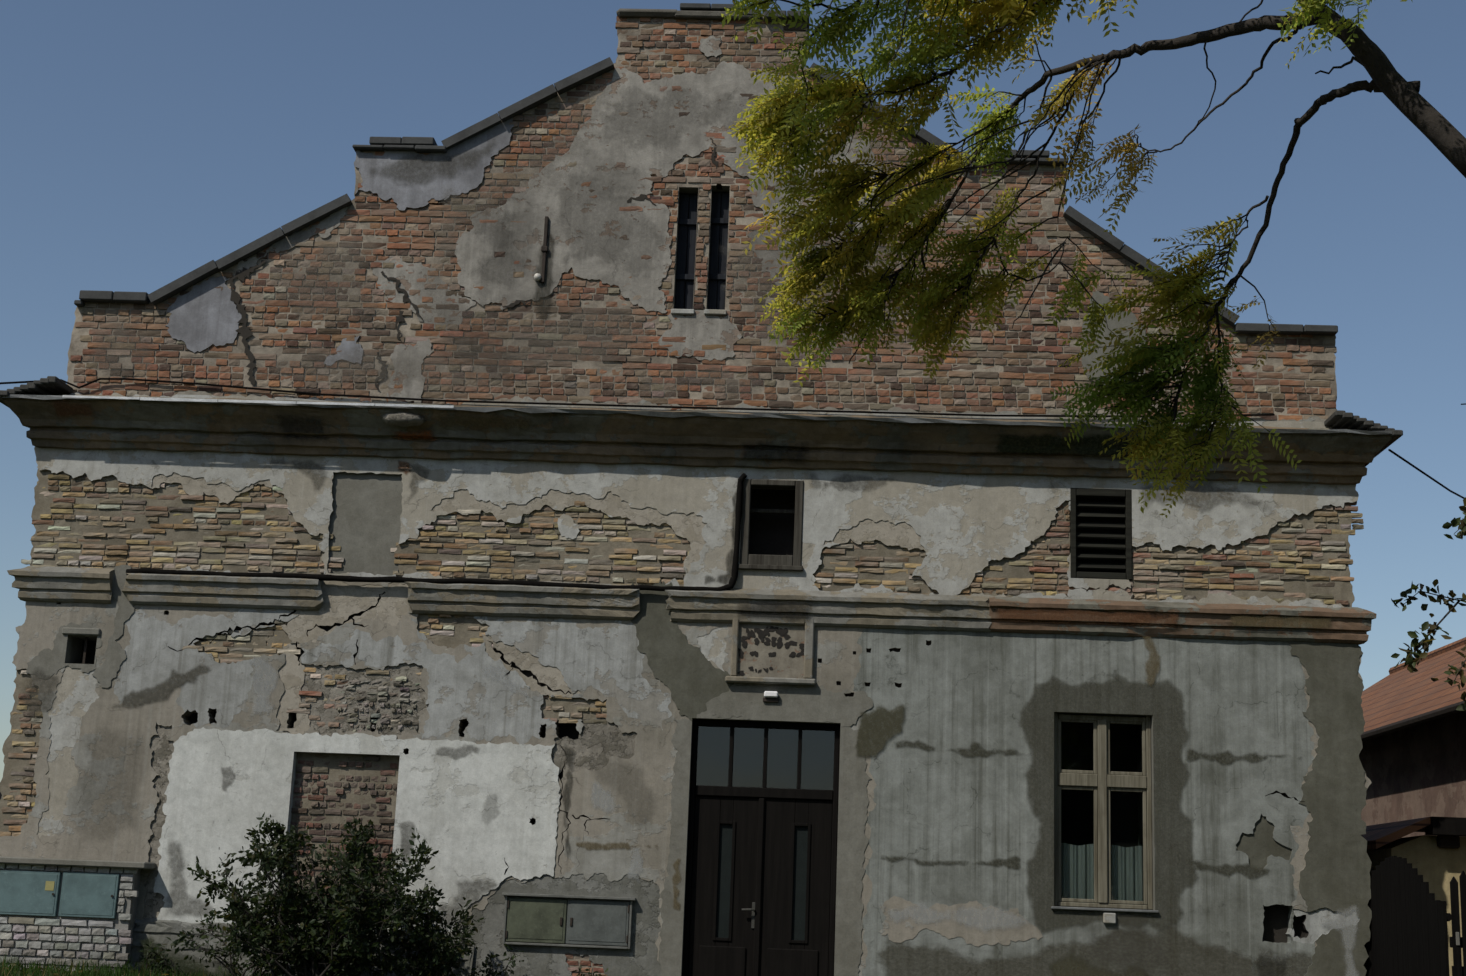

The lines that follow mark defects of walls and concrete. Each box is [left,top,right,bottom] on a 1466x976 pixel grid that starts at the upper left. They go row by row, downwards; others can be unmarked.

flaking render [66,16,1337,424]
crack [227,260,267,385]
crack [375,271,423,389]
flaking render [21,469,344,574]
flaking render [390,501,691,586]
flaking render [813,539,939,594]
flaking render [957,500,1364,607]
crack [168,591,386,665]
crack [491,643,571,694]
flaking render [0,669,43,837]
flaking render [182,619,429,924]
flaking render [1236,814,1292,869]